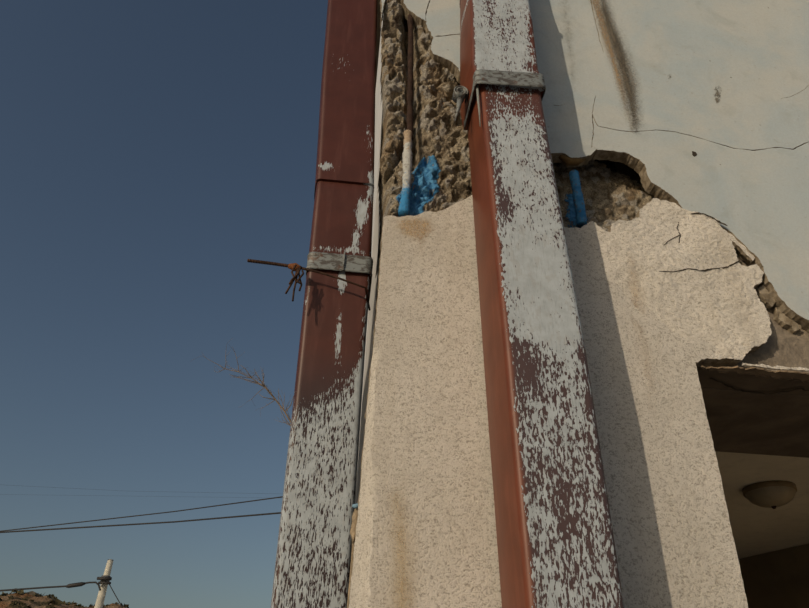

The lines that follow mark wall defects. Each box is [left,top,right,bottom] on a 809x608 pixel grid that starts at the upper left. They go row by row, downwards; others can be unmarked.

spalling [375,0,472,278]
flaking render [553,155,655,232]
crack [664,212,727,245]
crack [660,261,739,272]
flaking render [724,229,755,267]
flaking render [700,285,809,383]